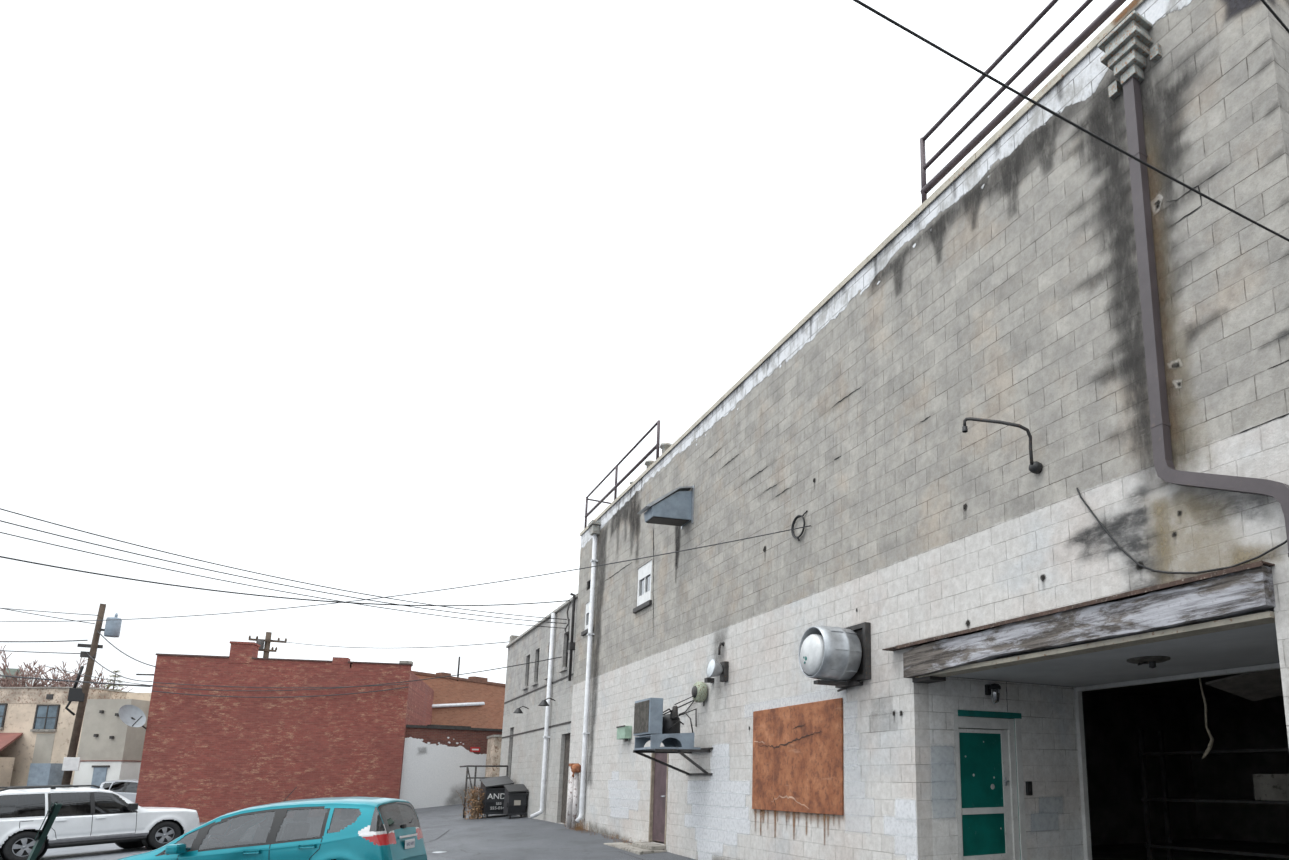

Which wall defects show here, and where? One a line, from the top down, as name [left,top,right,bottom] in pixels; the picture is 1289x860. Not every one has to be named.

damp [1224,0,1274,19]
damp [874,113,1069,292]
damp [1081,77,1152,464]
damp [1140,72,1185,464]
damp [1075,512,1140,542]
damp [1226,550,1273,567]
rust [755,810,807,837]